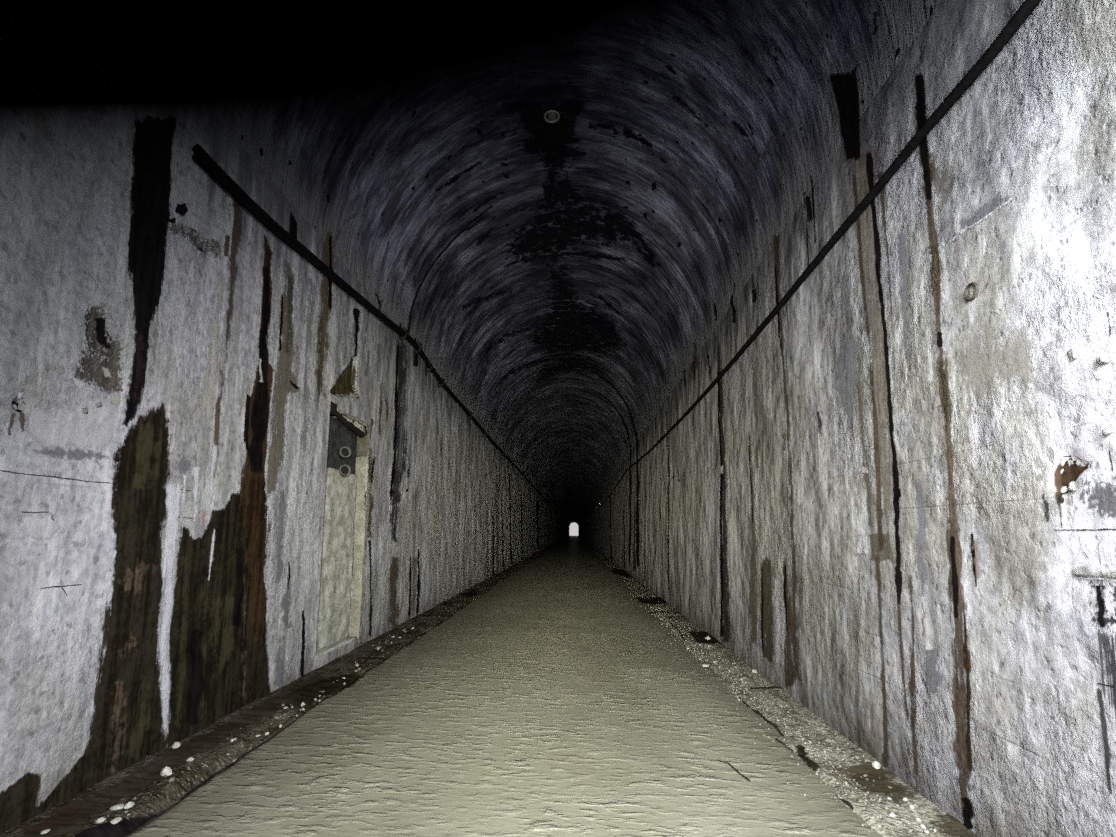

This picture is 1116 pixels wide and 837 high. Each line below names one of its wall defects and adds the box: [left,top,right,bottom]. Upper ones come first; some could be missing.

peeling [8,305,124,460]
leakage [0,116,361,837]
leakage [588,246,655,269]
leakage [830,69,942,804]
rust [915,73,980,829]
leakage [1080,449,1116,519]
leakage [1090,535,1116,793]